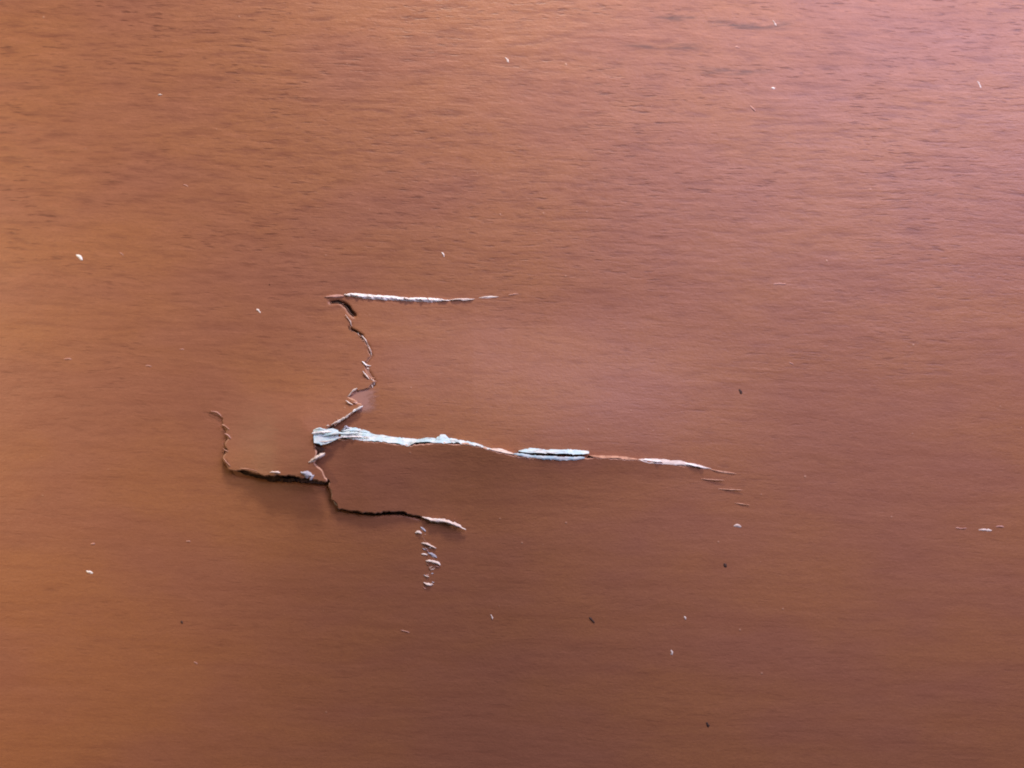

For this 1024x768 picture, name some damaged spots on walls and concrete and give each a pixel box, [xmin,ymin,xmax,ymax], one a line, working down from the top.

crack [270,293,748,527]
spalling [415,527,440,589]